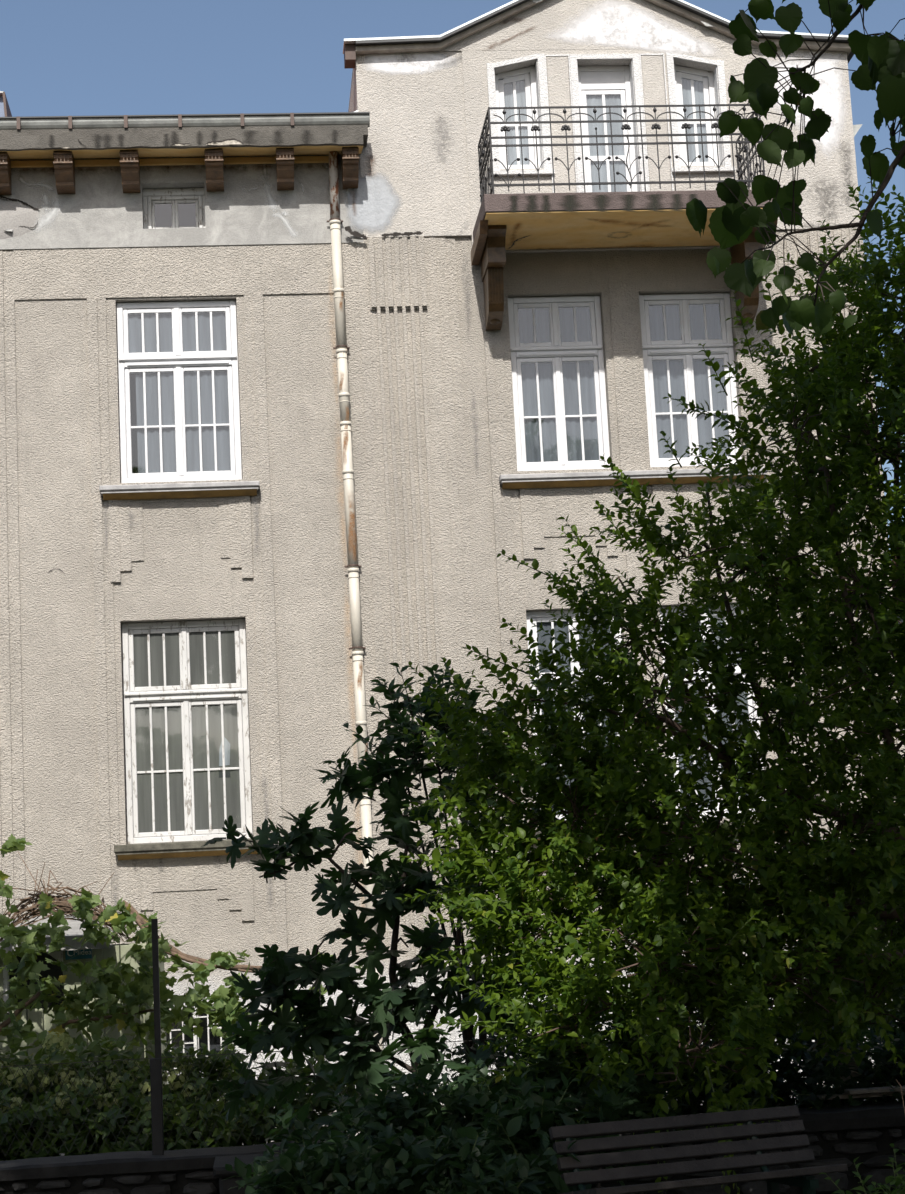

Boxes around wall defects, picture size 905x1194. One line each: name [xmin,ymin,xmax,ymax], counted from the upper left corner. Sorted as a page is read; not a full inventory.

crack [0,195,40,228]
rust [349,506,357,554]